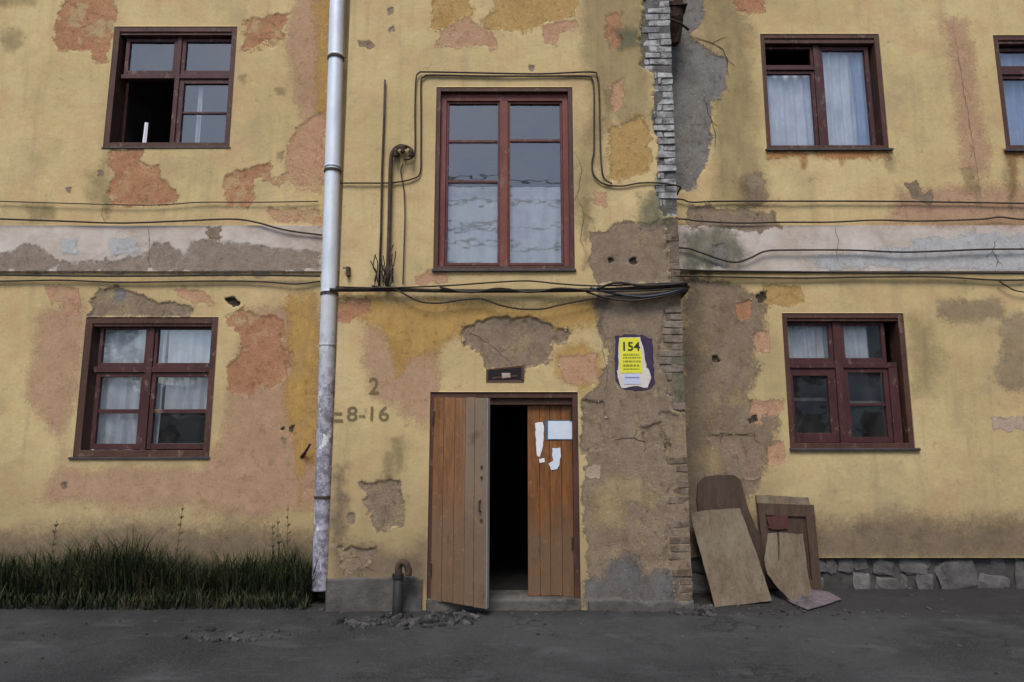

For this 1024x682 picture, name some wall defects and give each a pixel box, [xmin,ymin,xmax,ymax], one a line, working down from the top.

peeling [54,0,119,64]
peeling [97,148,179,207]
peeling [222,112,326,209]
peeling [0,226,321,318]
peeling [226,297,294,398]
flaking render [459,0,805,603]
flaking render [336,478,406,574]